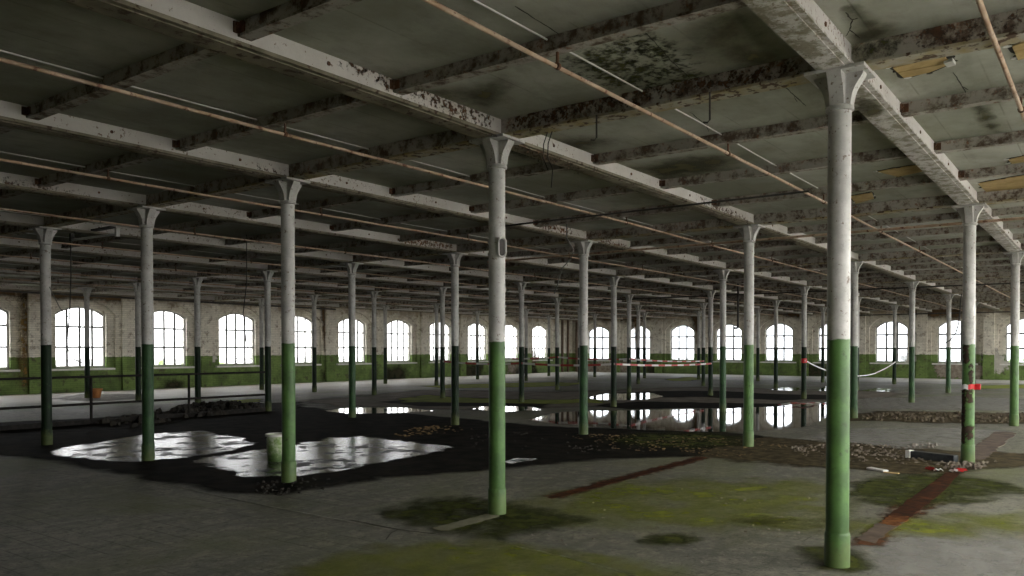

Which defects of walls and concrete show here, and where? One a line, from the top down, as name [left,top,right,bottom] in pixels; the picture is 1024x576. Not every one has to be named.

rust [339,61,494,127]
damp [563,17,773,88]
flaking render [886,56,958,79]
flaking render [976,155,1024,192]
peeling [933,317,1009,444]